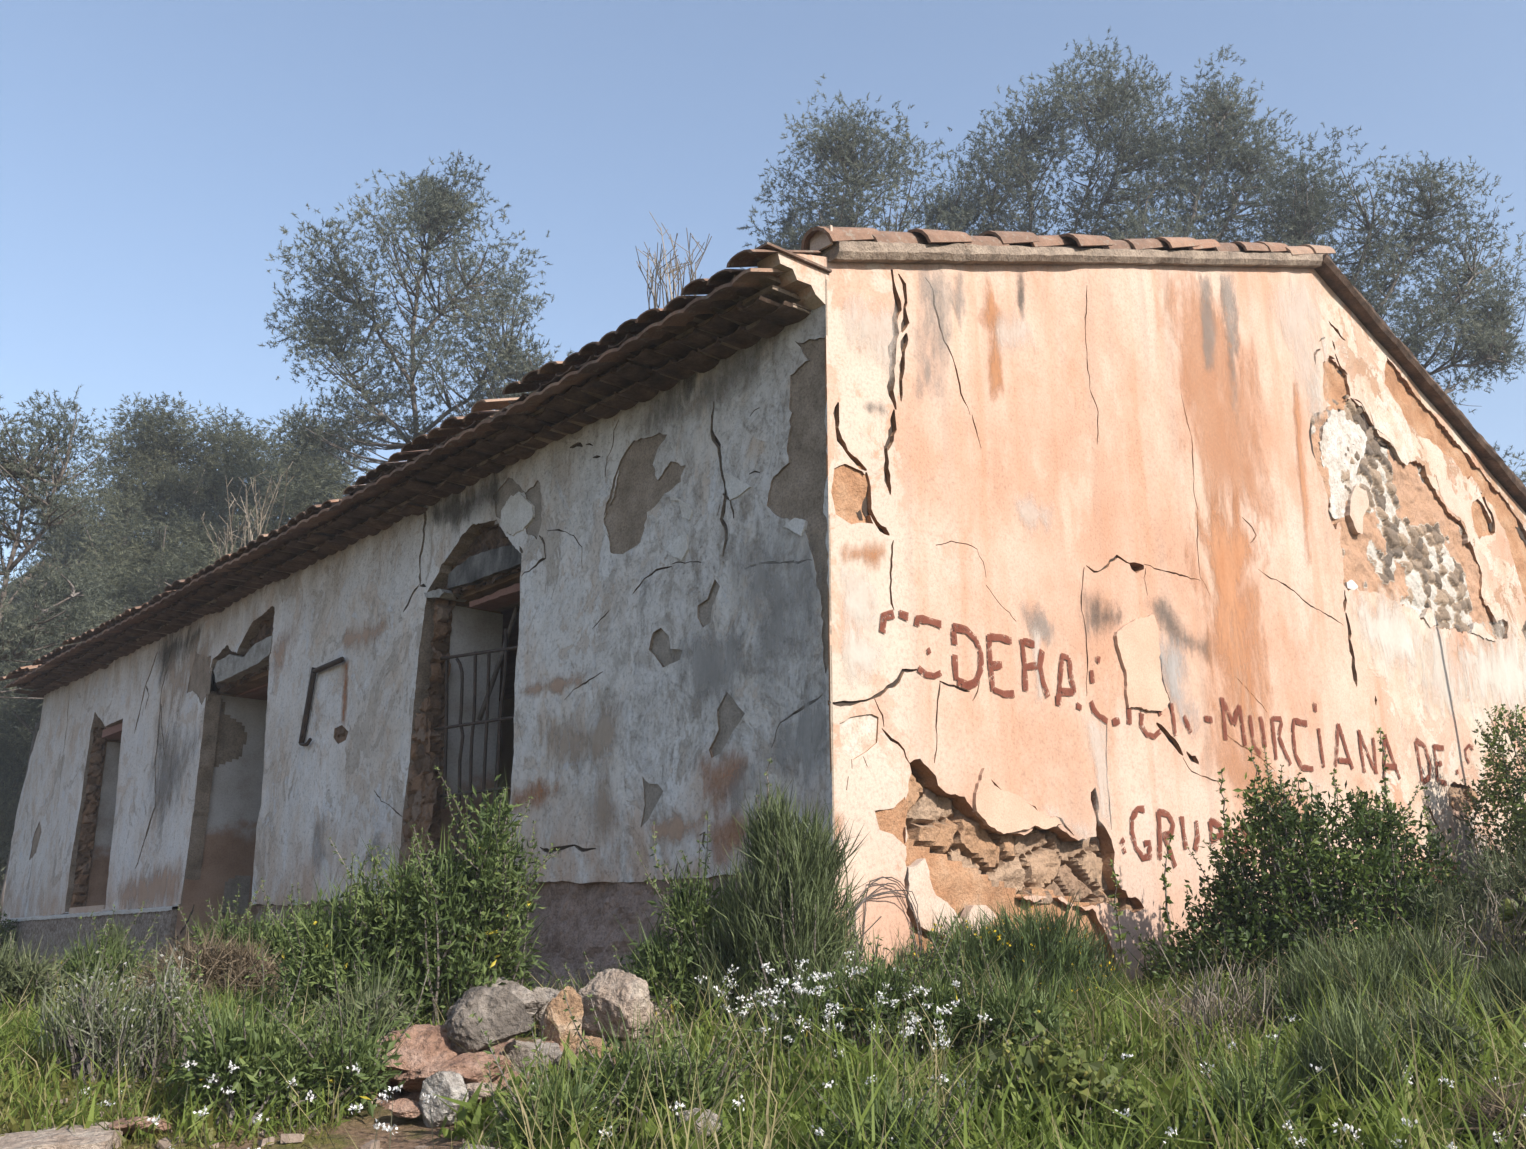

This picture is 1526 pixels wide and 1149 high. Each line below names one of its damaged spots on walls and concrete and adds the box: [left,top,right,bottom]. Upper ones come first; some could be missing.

peeling [605,433,693,560]
flaking render [723,472,751,500]
peeling [768,338,868,669]
crack [833,297,905,603]
leakage [1183,280,1269,729]
spalling [1310,358,1526,641]
peeling [188,611,275,767]
peeling [652,629,683,666]
peeling [711,694,745,757]
crack [1080,556,1196,655]
crack [1157,725,1216,781]
spalling [875,768,1136,976]